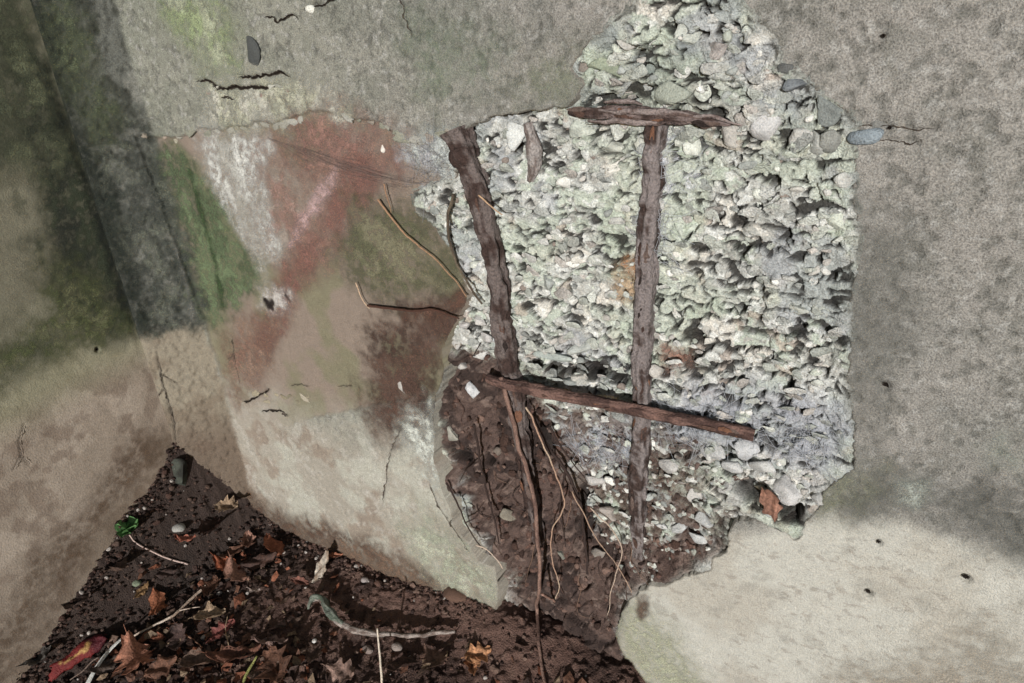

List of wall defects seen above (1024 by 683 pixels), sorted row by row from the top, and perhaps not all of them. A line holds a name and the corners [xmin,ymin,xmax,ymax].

crack [196,70,289,100]
crack [862,124,933,145]
leakage [202,71,456,398]
rust [614,256,635,300]
spalling [341,0,866,661]
rust [661,344,690,370]
leakage [403,415,439,479]
rust [646,438,698,519]